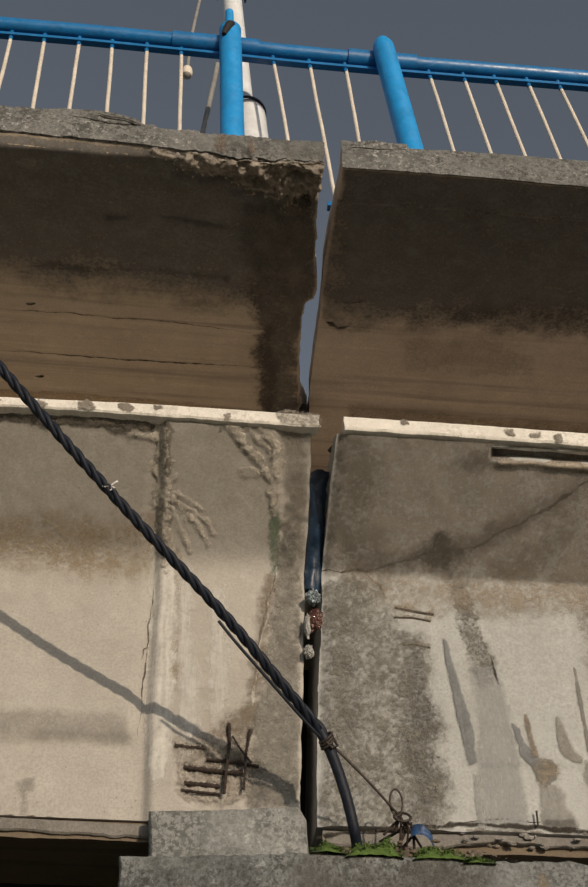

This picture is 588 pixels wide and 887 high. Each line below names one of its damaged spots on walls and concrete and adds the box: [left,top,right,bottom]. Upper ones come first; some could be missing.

spalling [149,147,326,202]
leakage [31,392,195,407]
crack [5,350,255,368]
leakage [242,194,315,414]
crack [321,481,588,596]
leakage [0,421,217,781]
crack [141,592,154,696]
leakage [210,590,261,734]
leakage [256,574,276,652]
leakage [443,639,477,764]
leakage [512,714,579,828]
leakage [556,668,588,783]